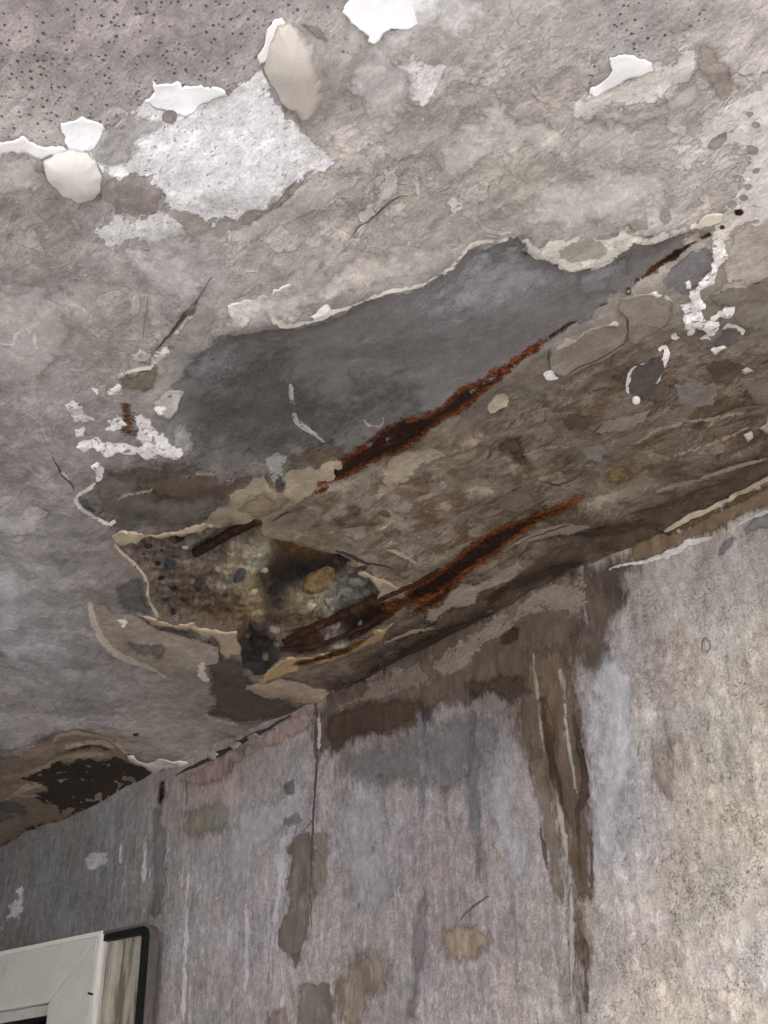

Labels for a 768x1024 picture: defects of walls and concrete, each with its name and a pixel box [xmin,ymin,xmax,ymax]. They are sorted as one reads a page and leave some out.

flaking render [0,18,335,284]
peeling [342,0,445,44]
flaking render [572,44,698,124]
spalling [73,82,768,705]
rust [316,321,576,494]
rust [382,494,586,616]
crack [176,703,321,927]
leakage [313,434,768,1024]